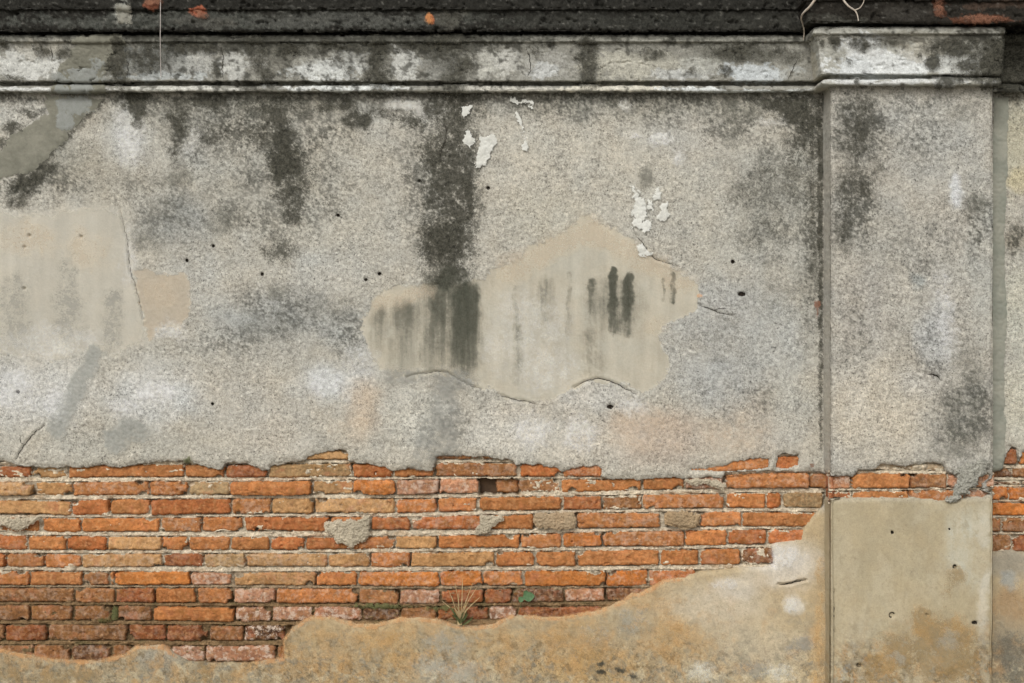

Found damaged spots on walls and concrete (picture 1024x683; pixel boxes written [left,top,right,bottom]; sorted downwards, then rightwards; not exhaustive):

water stain [814,35,909,65]
peeling [462,131,497,168]
peeling [510,96,534,151]
water stain [132,33,487,471]
peeling [359,185,702,403]
water stain [587,266,635,337]
water stain [662,272,677,304]
water stain [722,77,885,450]
flaking render [0,447,1024,663]